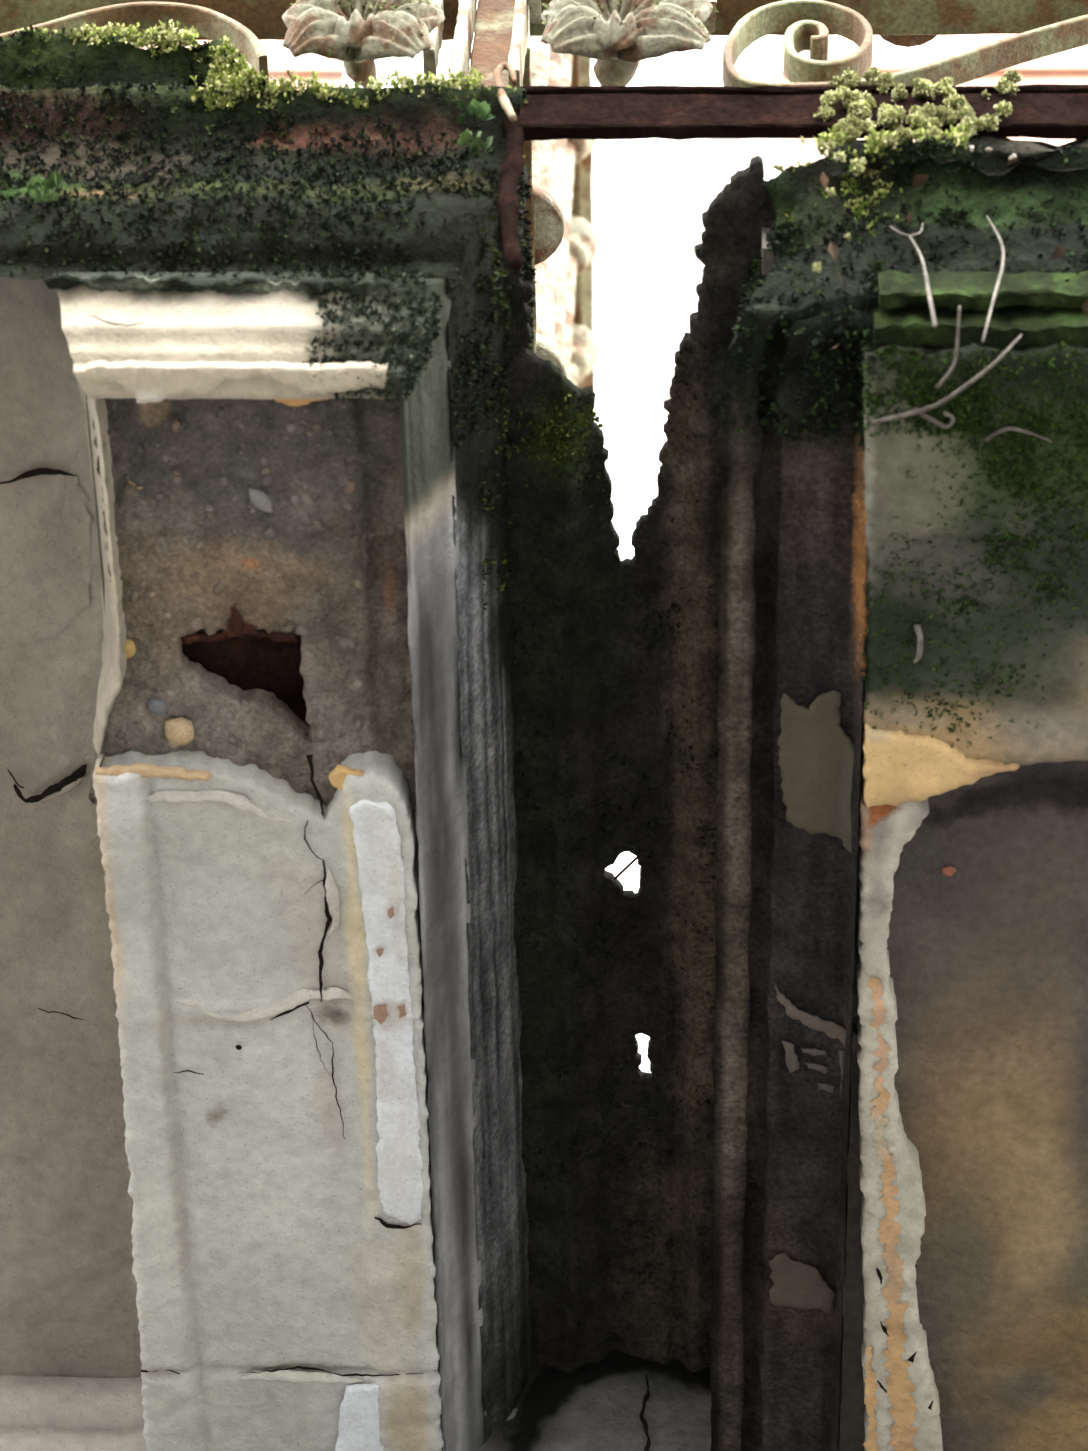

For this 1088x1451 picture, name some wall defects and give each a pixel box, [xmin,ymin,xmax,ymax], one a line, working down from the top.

crack [8,764,87,804]
spalling [86,360,423,1225]
crack [304,755,345,1139]
spalling [769,690,1019,1451]